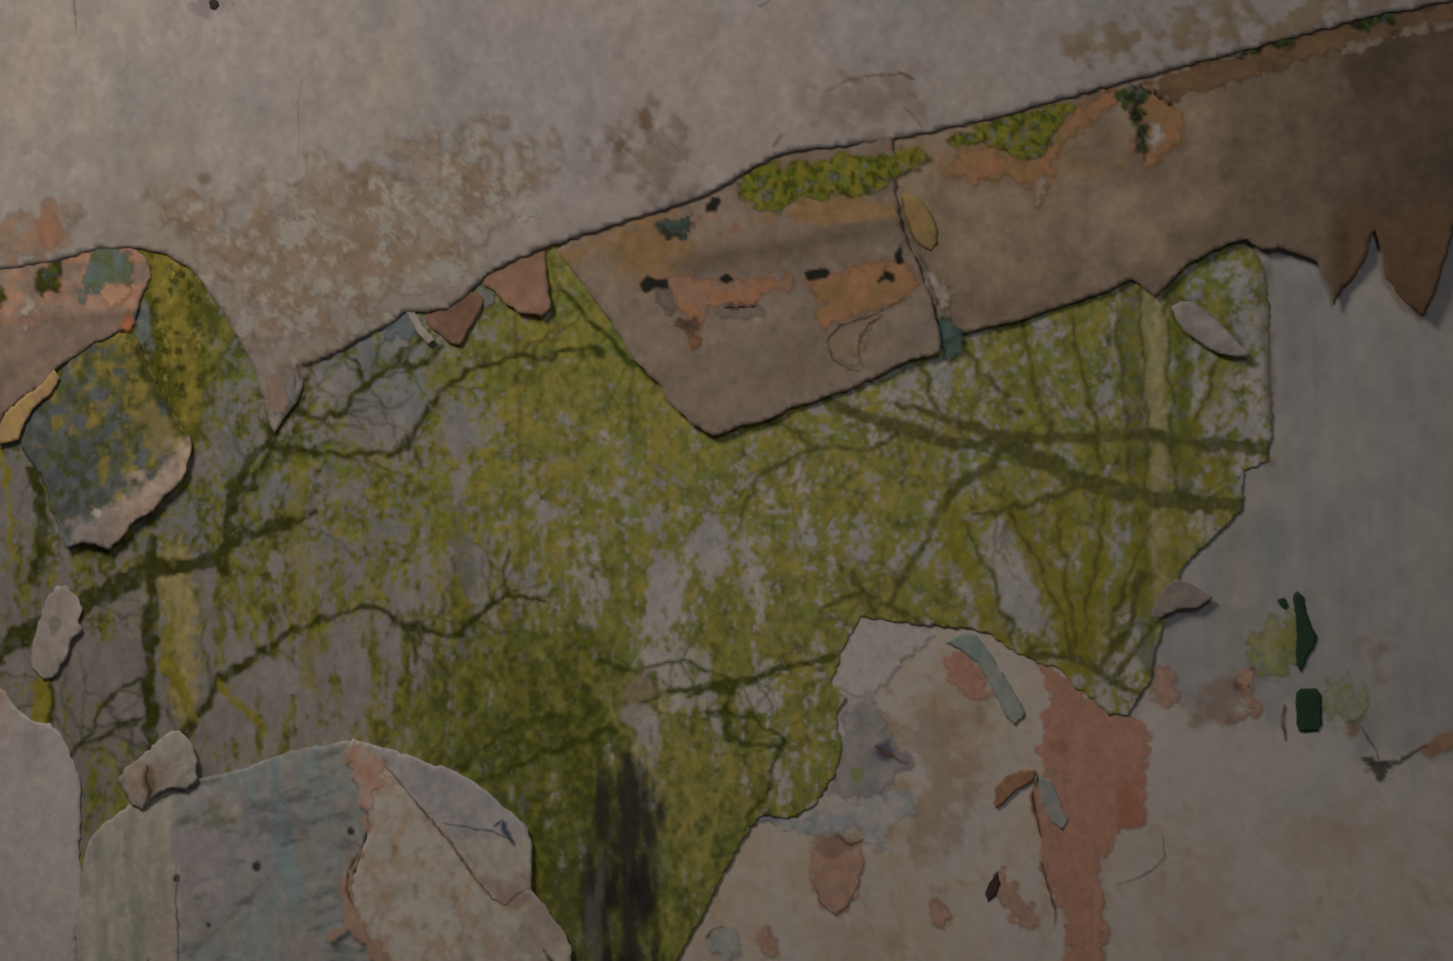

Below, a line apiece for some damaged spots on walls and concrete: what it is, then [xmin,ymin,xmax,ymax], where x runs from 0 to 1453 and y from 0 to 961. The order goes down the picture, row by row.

peeling [0,247,192,550]
flaking render [148,115,563,430]
peeling [557,0,1453,436]
peeling [0,687,572,961]
peeling [756,618,1151,961]
peeling [1148,666,1180,708]